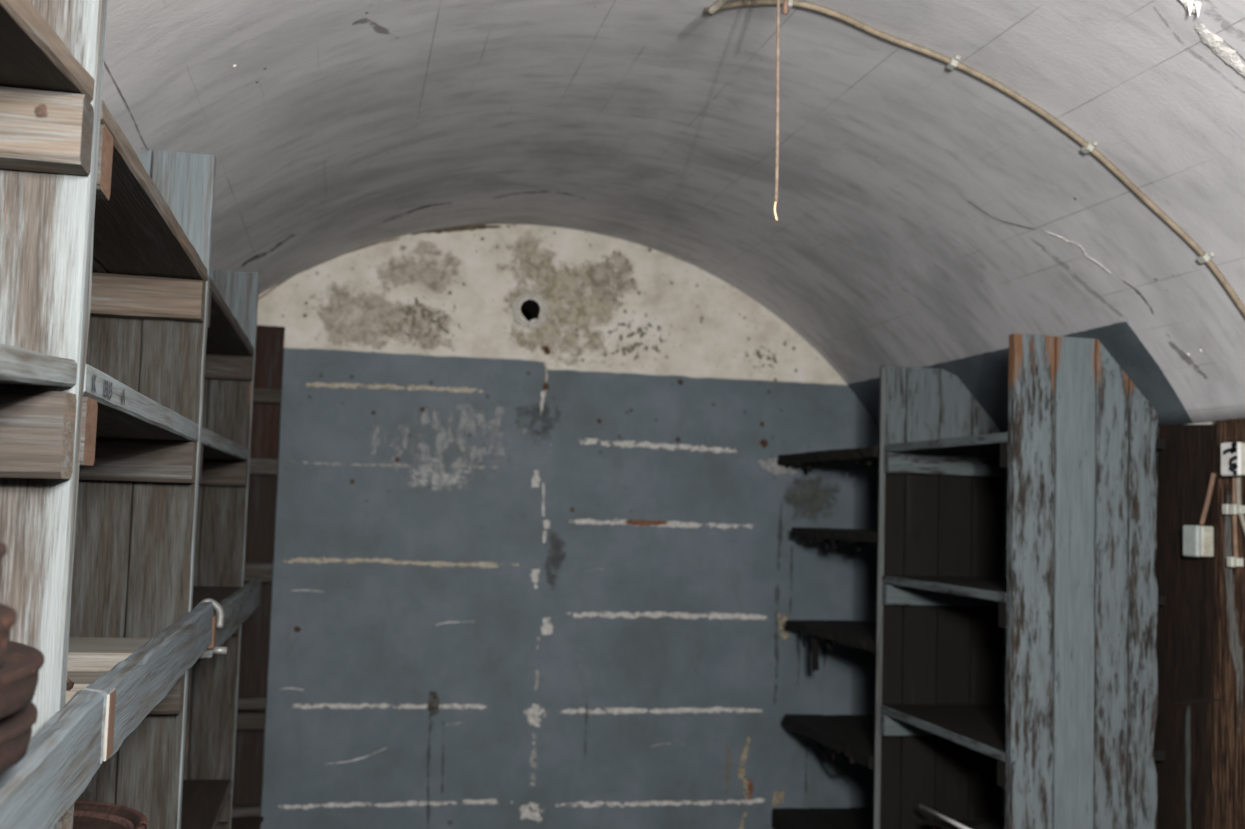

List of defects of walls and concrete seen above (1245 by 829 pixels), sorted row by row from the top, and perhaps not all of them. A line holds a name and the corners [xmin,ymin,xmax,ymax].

crack [1179,0,1245,78]
crack [104,61,148,150]
water stain [258,225,510,349]
water stain [499,238,672,365]